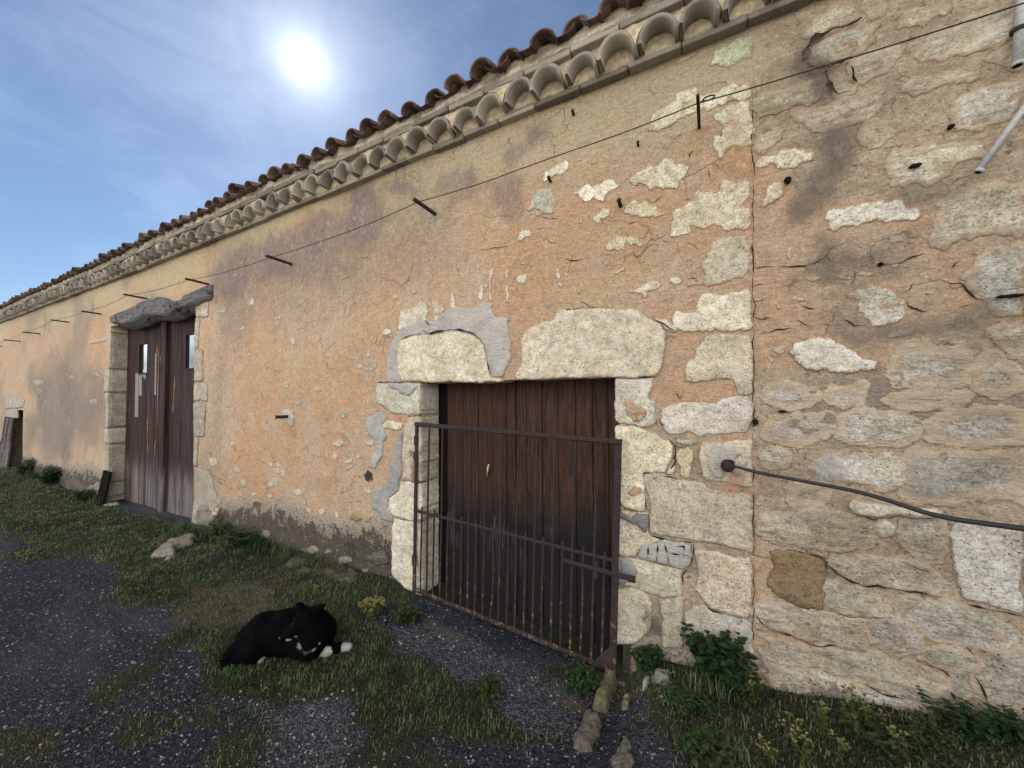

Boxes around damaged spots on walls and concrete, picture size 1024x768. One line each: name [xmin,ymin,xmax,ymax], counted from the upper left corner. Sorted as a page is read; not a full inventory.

peeling [517,159,569,242]
peeling [573,84,815,298]
peeling [382,290,456,336]
crack [752,240,977,334]
peeling [624,399,646,422]